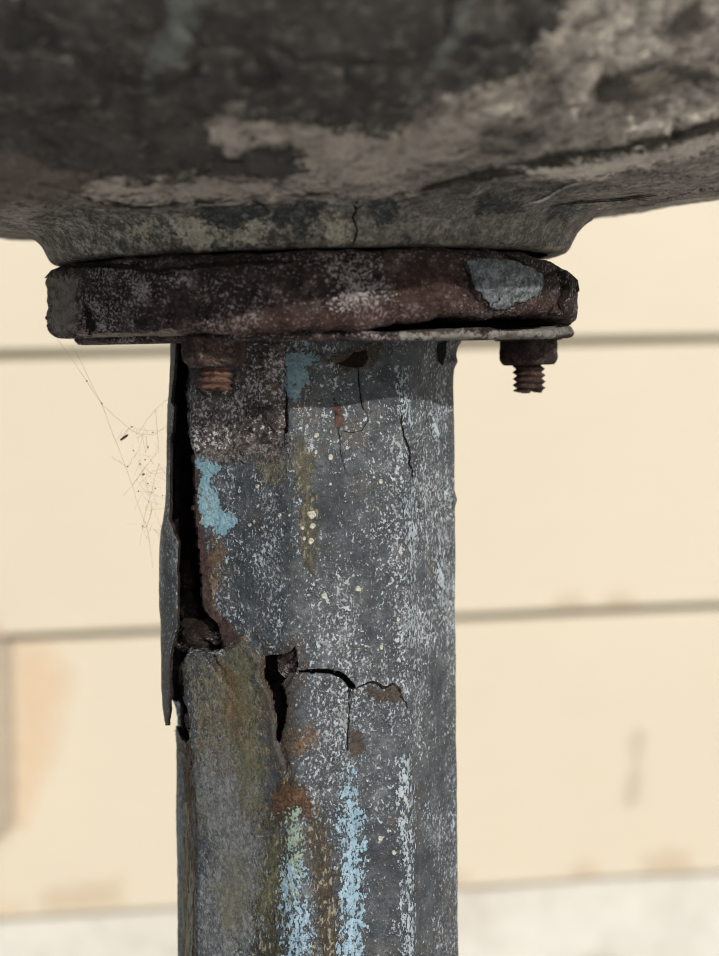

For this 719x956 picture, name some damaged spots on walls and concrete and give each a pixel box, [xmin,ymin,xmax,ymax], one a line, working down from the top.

damp [0,0,601,338]
damp [594,65,719,106]
spalling [76,328,339,726]
crack [175,453,244,695]
crack [333,350,369,469]
crack [400,413,413,480]
crack [299,669,408,757]
corrosion [178,742,199,955]